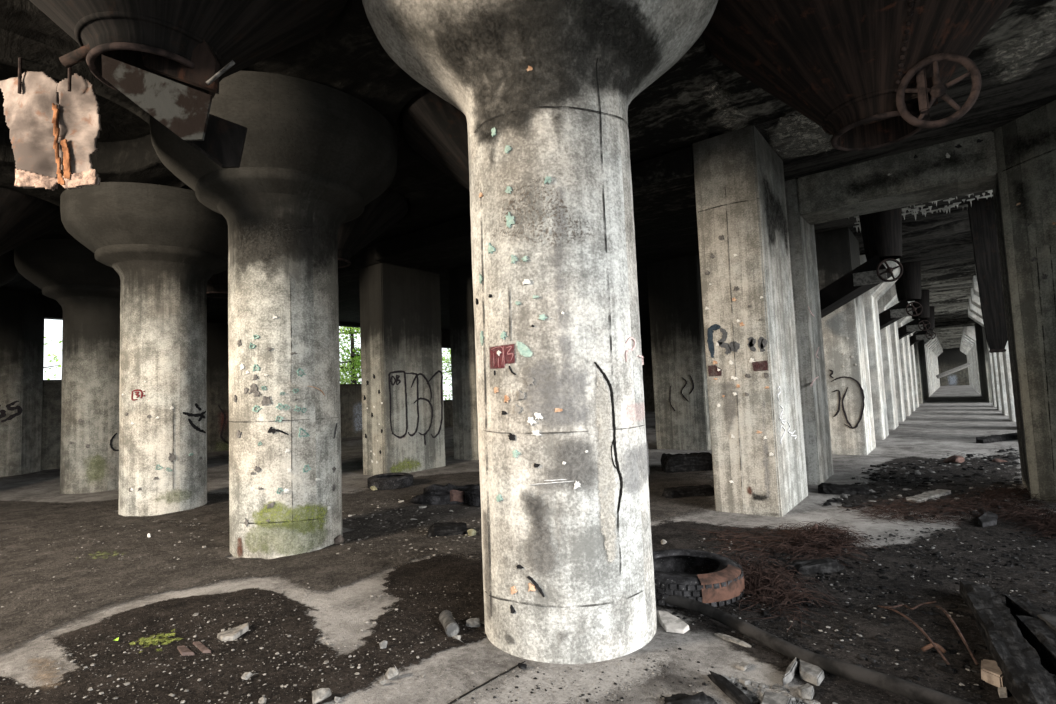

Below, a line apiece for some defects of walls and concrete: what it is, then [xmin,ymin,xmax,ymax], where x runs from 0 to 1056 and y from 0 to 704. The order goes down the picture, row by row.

rust [0,57,102,191]